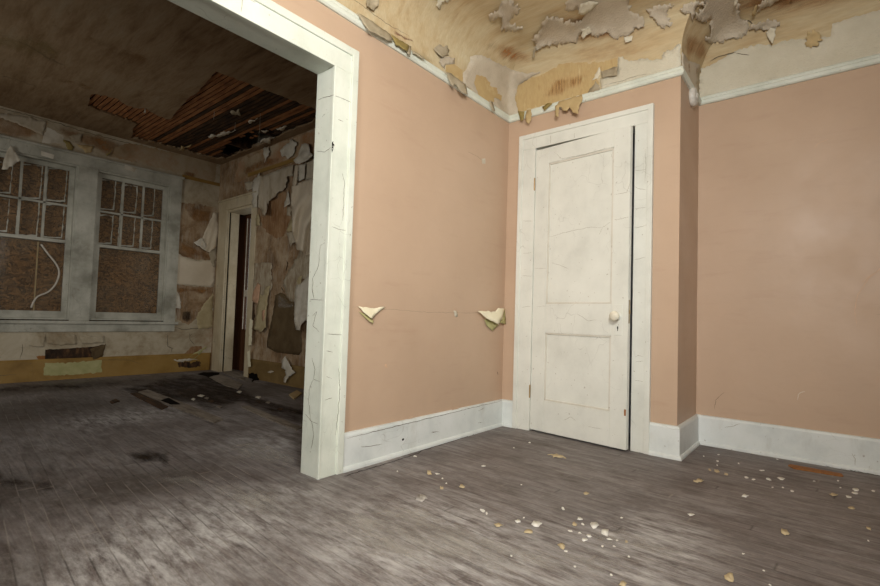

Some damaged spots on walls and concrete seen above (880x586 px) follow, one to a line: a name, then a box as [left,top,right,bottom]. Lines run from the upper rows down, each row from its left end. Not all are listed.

peeling [357,0,425,59]
peeling [433,0,880,124]
flaking render [179,203,216,260]
flaking render [175,284,214,325]
spalling [37,344,106,359]
spalling [174,346,207,368]